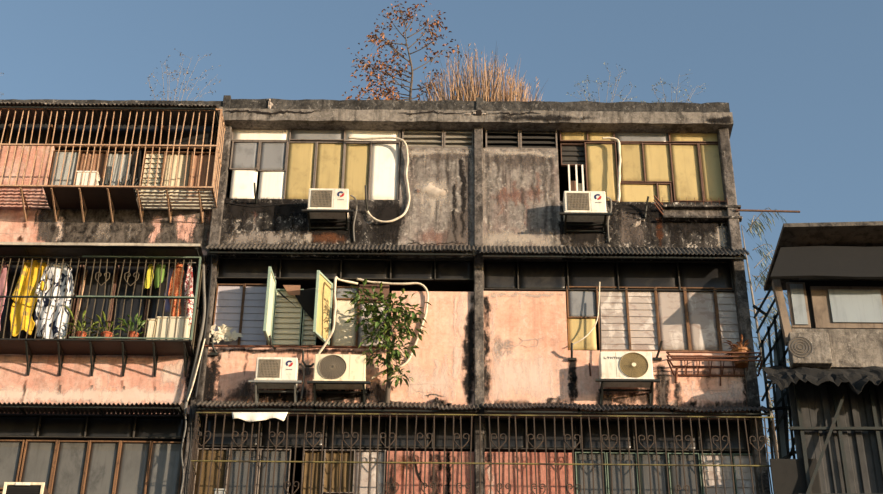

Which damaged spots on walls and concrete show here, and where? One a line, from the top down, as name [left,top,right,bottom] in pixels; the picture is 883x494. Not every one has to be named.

water stain [409,149,470,246]
water stain [487,149,553,176]
water stain [35,195,405,406]
water stain [453,293,578,410]